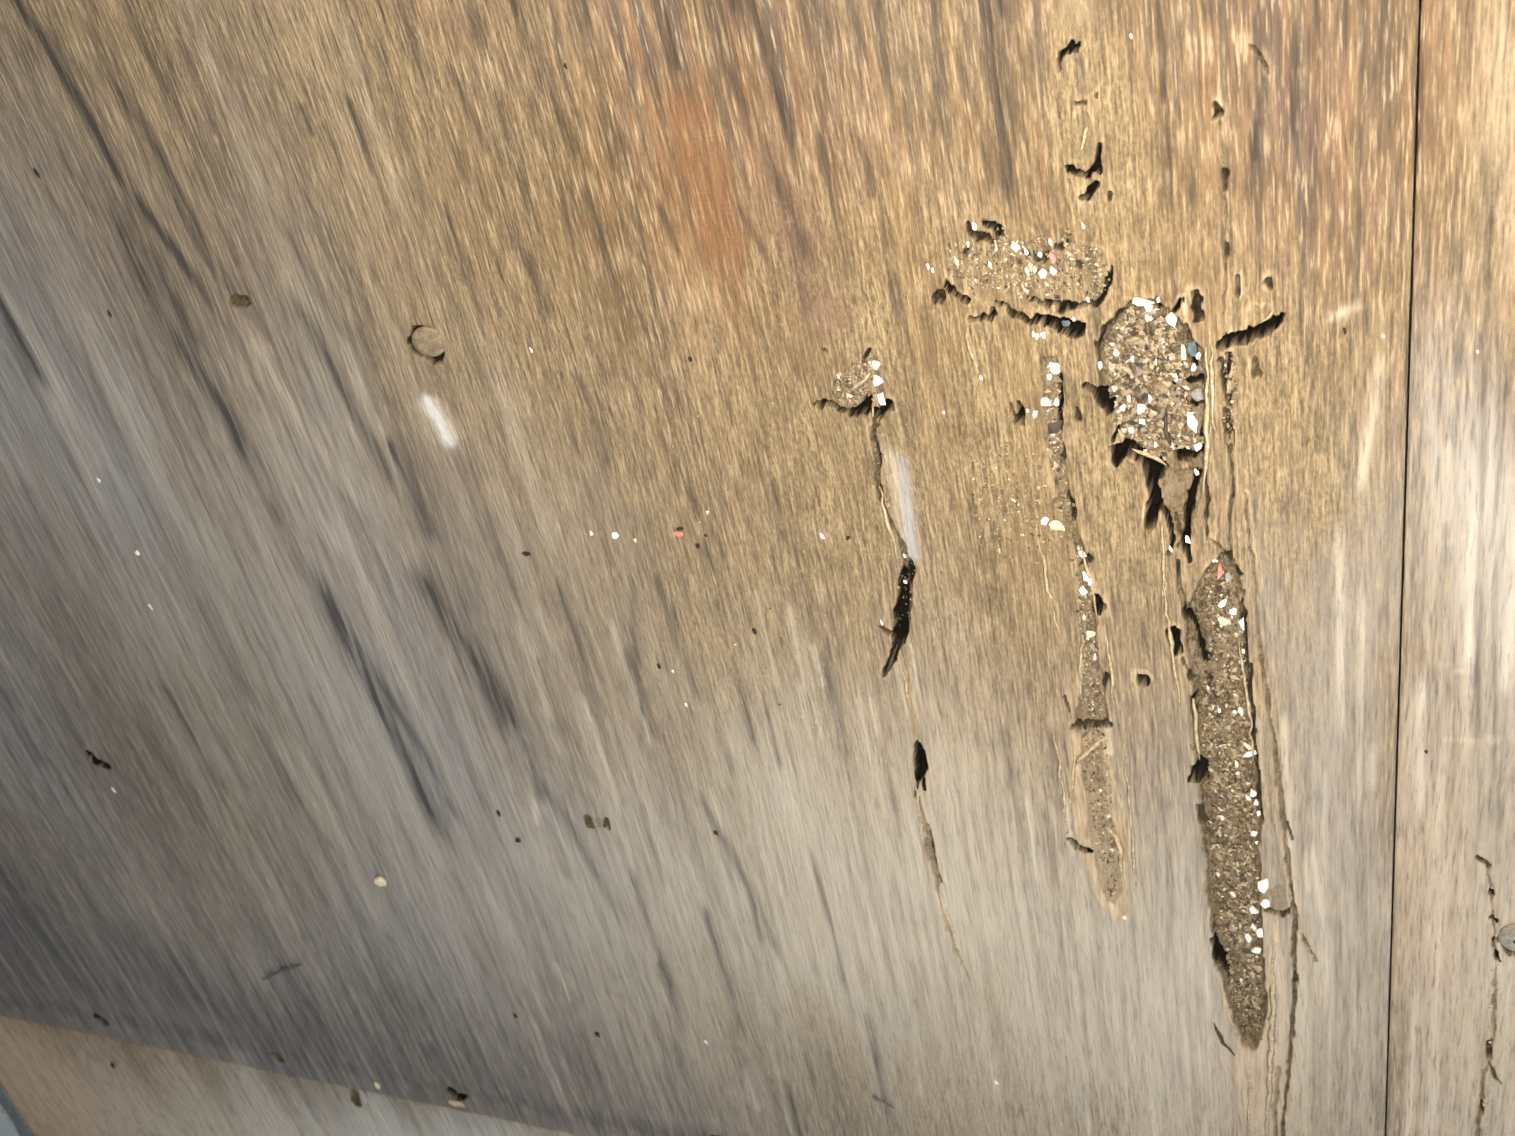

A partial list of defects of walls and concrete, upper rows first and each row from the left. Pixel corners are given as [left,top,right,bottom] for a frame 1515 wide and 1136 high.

spalling [918,203,1142,928]
peeling [1165,312,1197,360]
peeling [1187,412,1198,433]
spalling [1157,530,1283,1136]
crack [1464,847,1515,1136]